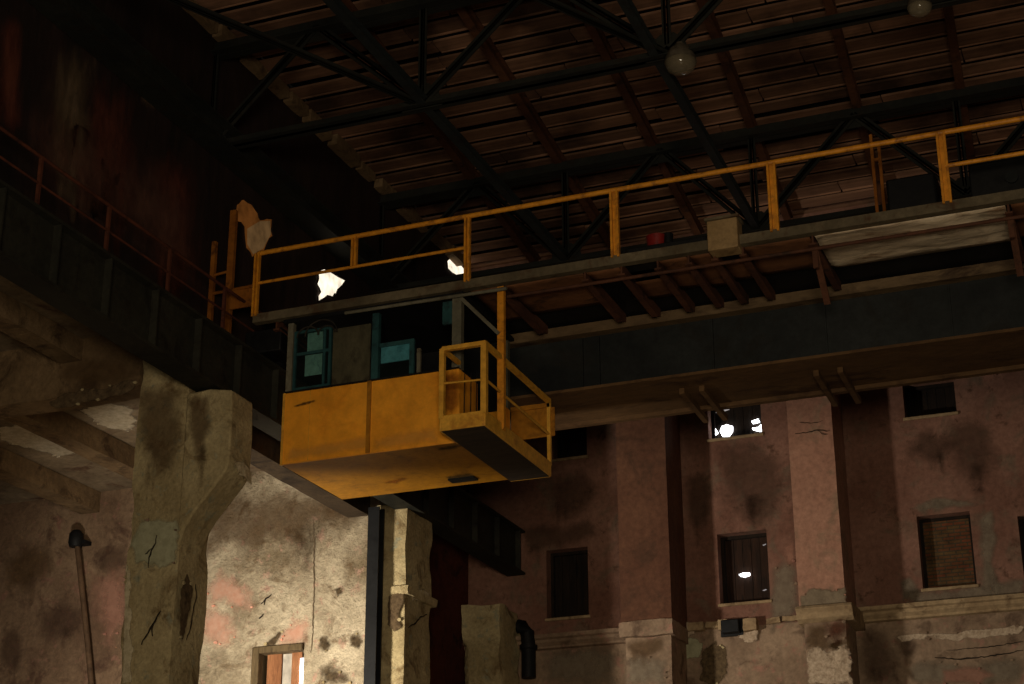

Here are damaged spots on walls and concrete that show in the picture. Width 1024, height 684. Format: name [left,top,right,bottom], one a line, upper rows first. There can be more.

crack [145,535,157,568]
crack [141,610,161,645]
spalling [388,591,404,631]
flaking render [807,620,853,684]
flaking render [897,625,1024,642]
crack [935,641,1023,660]